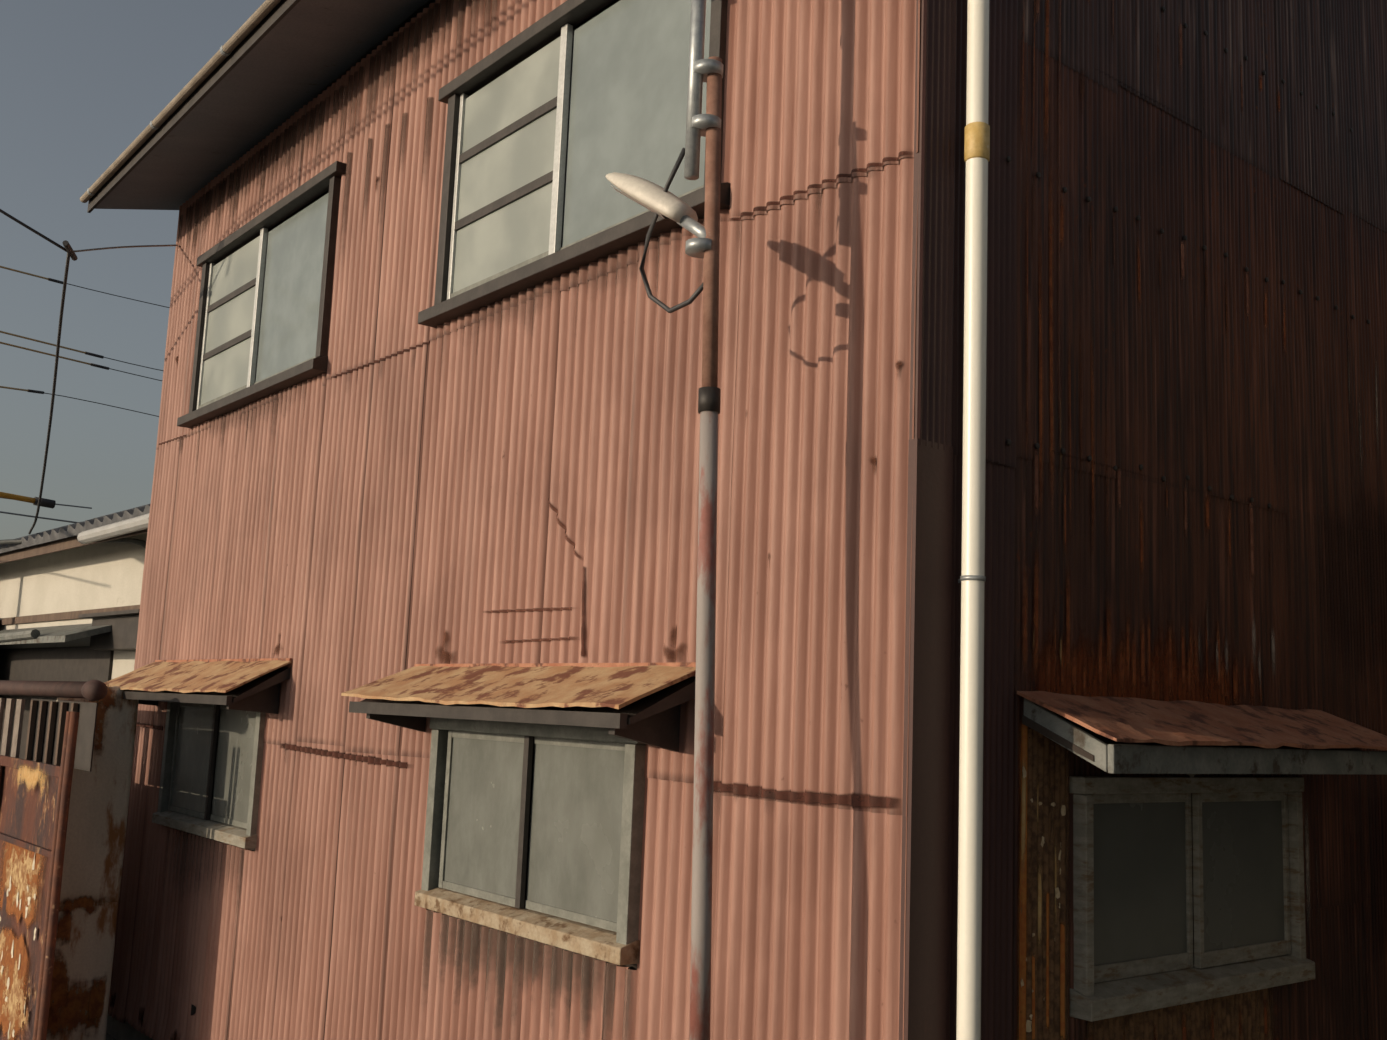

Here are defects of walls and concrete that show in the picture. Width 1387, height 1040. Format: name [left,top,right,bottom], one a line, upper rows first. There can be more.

rust [1026,182,1107,547]
rust [439,632,452,664]
rust [1022,572,1262,706]
rust [70,684,132,751]
rust [46,896,116,1039]